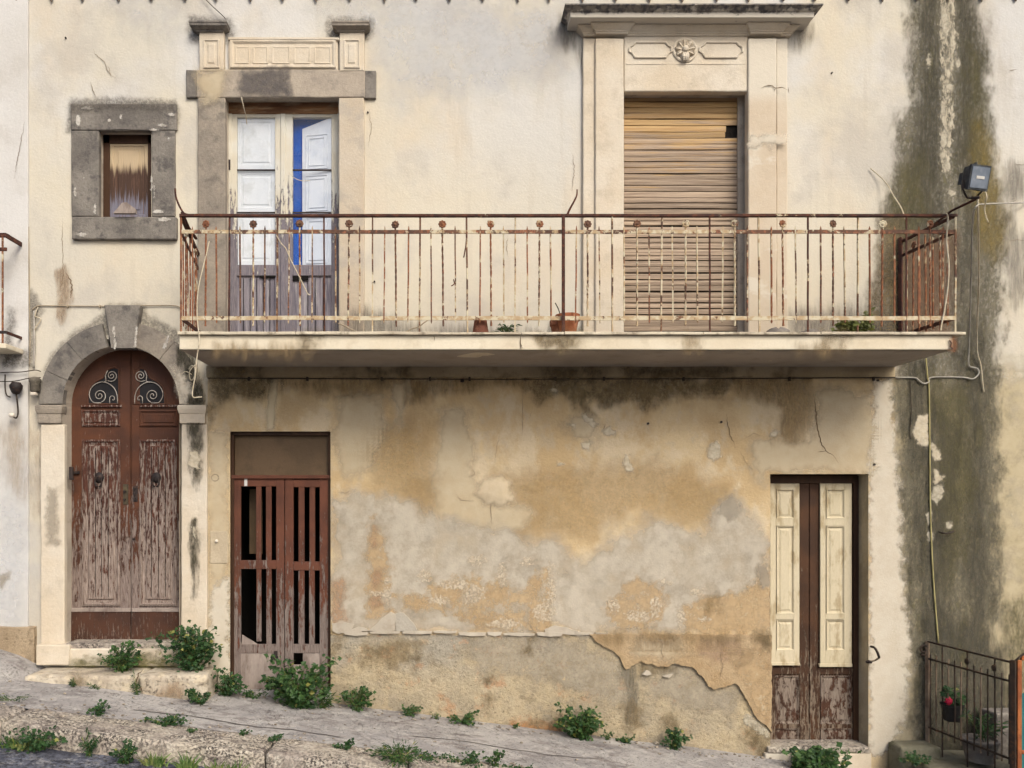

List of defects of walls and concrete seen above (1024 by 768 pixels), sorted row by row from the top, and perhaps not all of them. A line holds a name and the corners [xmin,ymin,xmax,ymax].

damp [57,224,73,319]
damp [866,0,1024,750]
damp [187,423,203,481]
crack [813,393,838,462]
flaking render [913,414,945,541]
damp [189,518,199,588]
flaking render [331,491,772,738]